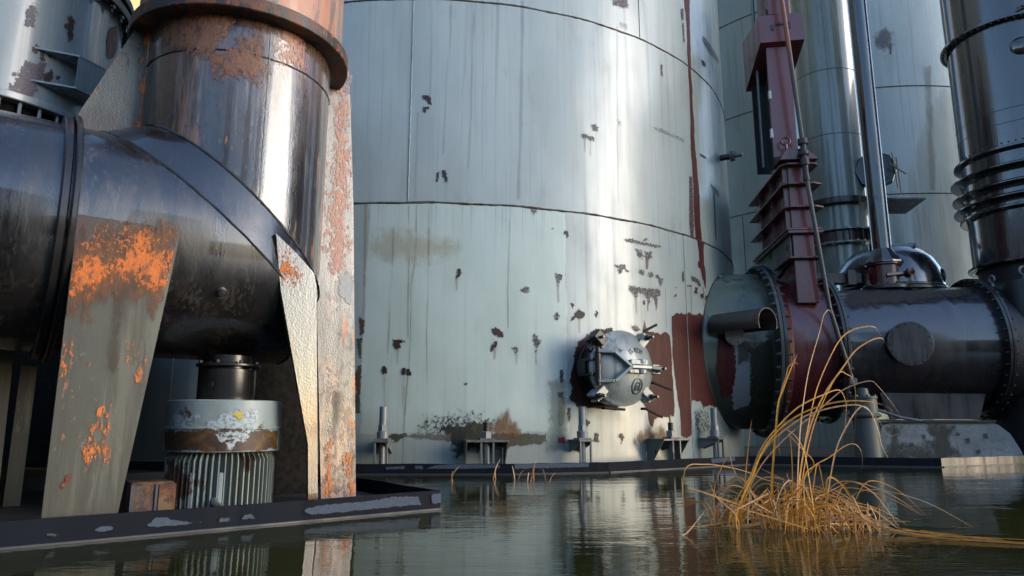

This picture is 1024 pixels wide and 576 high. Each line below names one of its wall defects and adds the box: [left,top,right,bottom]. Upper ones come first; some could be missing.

rust [131,14,309,127]
rust [322,64,353,275]
rust [67,219,177,319]
rust [277,249,303,300]
rust [82,403,112,468]
peeling [172,407,261,431]
water stain [388,410,546,459]